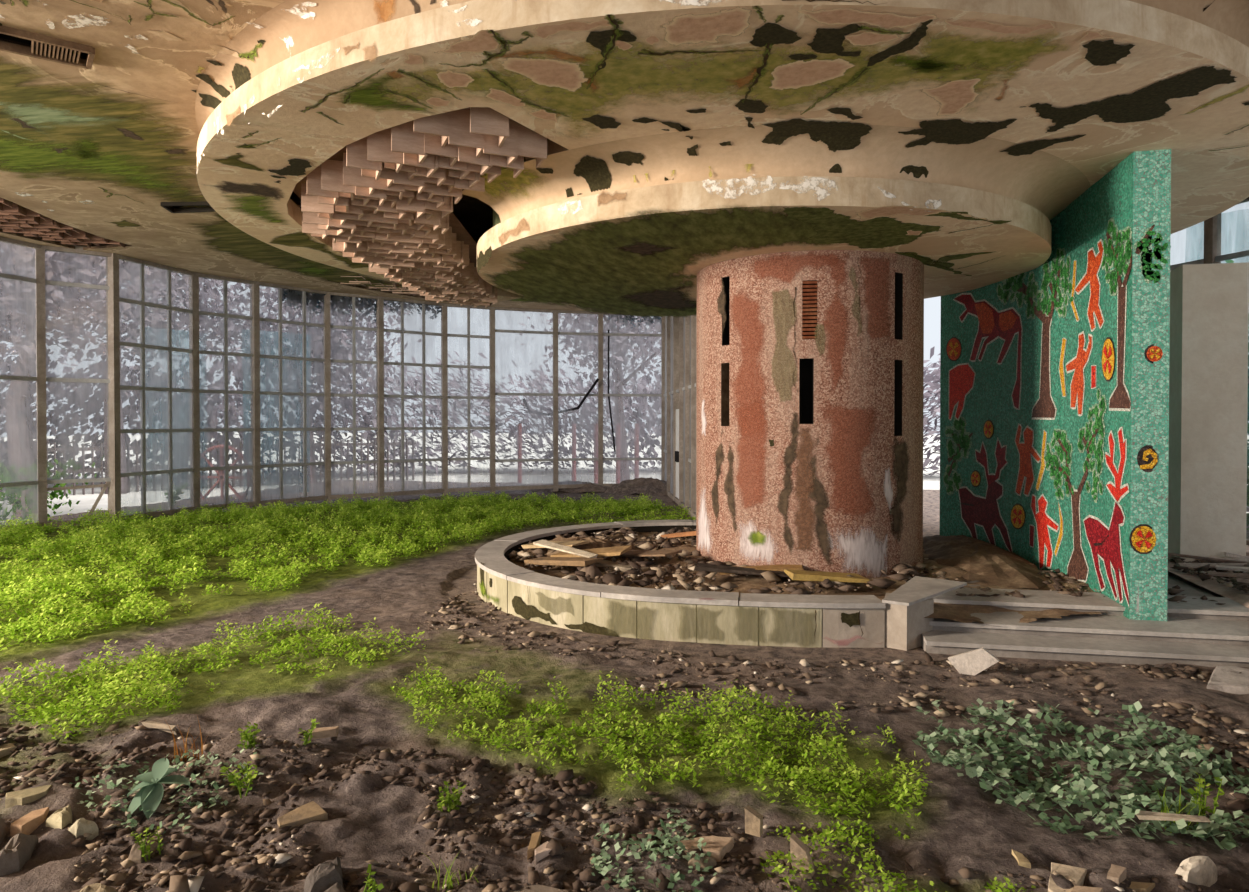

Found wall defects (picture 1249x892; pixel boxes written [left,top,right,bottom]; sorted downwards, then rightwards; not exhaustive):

peeling [281,2,316,19]
leakage [344,43,376,61]
spalling [898,66,1237,156]
spalling [582,109,706,156]
spalling [900,165,929,178]
leakage [598,173,648,204]
leakage [499,218,529,246]
leakage [698,413,909,576]